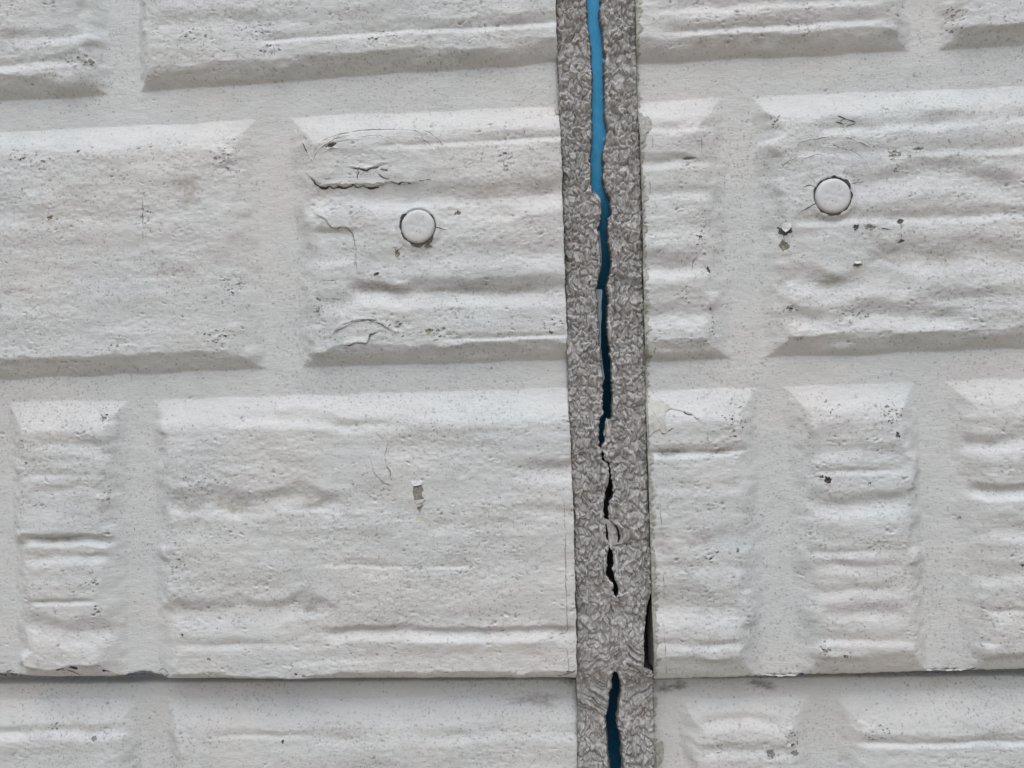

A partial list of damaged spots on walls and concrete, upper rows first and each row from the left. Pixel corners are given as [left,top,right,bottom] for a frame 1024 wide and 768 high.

peeling [311,164,429,190]
crack [585,0,620,596]
spalling [410,480,425,521]
crack [644,539,654,671]
crack [604,673,624,768]